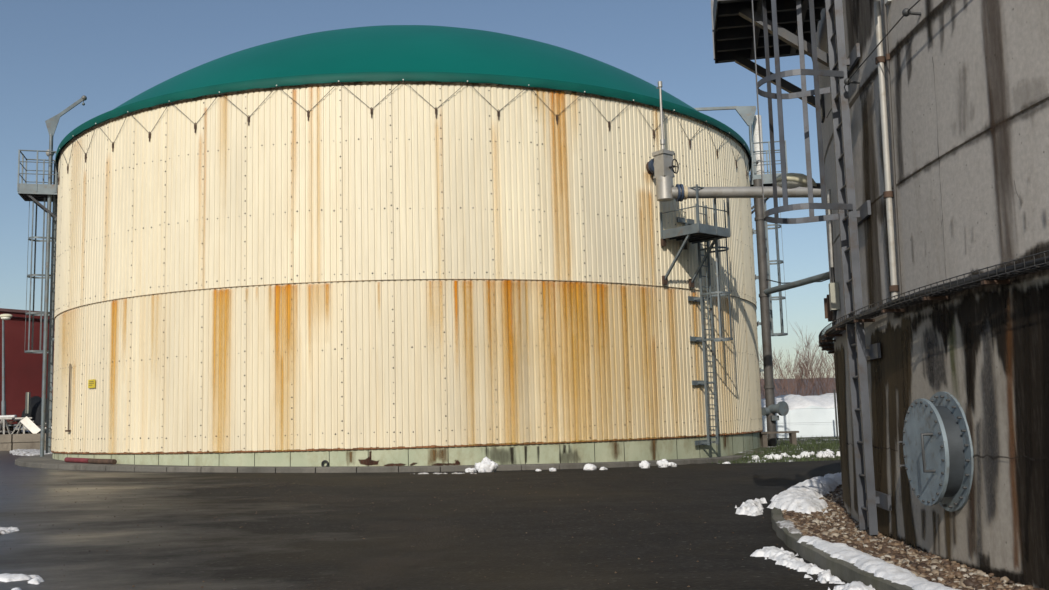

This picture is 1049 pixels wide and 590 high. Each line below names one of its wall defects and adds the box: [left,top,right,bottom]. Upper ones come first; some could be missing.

water stain [846,0,873,67]
corrosion [214,289,227,396]
corrosion [275,284,292,387]
corrosion [454,280,468,324]
corrosion [488,280,520,391]
corrosion [543,281,584,381]
corrosion [597,284,605,338]
water stain [859,0,1049,590]
water stain [834,345,858,512]